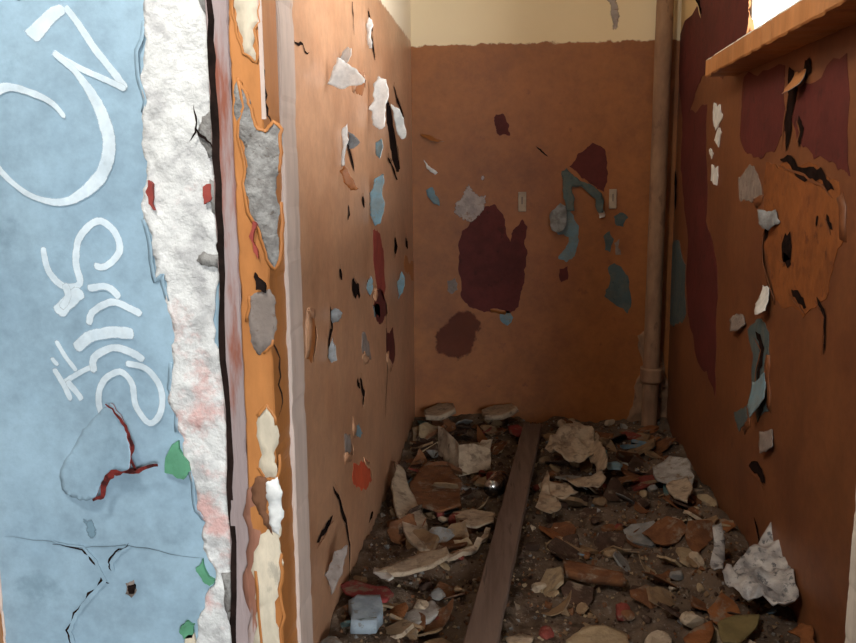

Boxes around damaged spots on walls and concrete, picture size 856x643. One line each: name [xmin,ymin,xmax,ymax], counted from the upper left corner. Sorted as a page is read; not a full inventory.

flaking render [134,0,232,643]
peeling [230,0,262,64]
peeling [234,78,285,271]
peeling [245,289,277,355]
peeling [327,47,407,172]
peeling [366,174,395,372]
peeling [447,204,528,326]
peeling [549,143,631,314]
peeling [670,0,754,395]
peeling [729,53,850,453]
crack [16,537,196,643]
peeling [243,404,286,643]